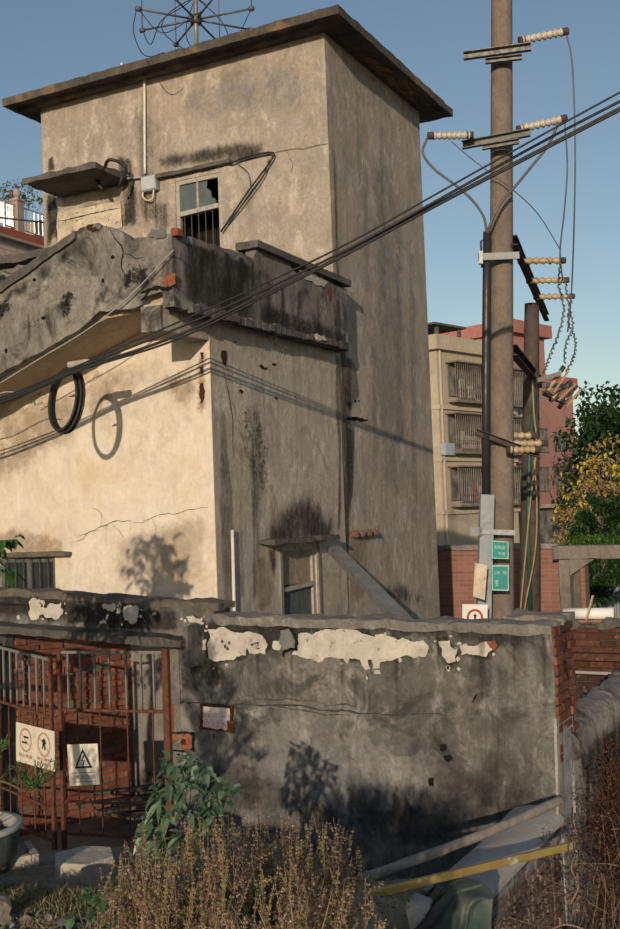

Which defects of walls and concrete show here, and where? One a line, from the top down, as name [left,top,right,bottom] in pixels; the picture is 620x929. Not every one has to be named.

water stain [162,145,260,165]
spalling [140,273,177,301]
mould [59,292,76,317]
water stain [186,244,358,552]
crack [75,507,207,542]
peeling [17,598,67,621]
peeling [99,601,157,630]
peeling [180,616,281,669]
peeling [292,629,498,680]